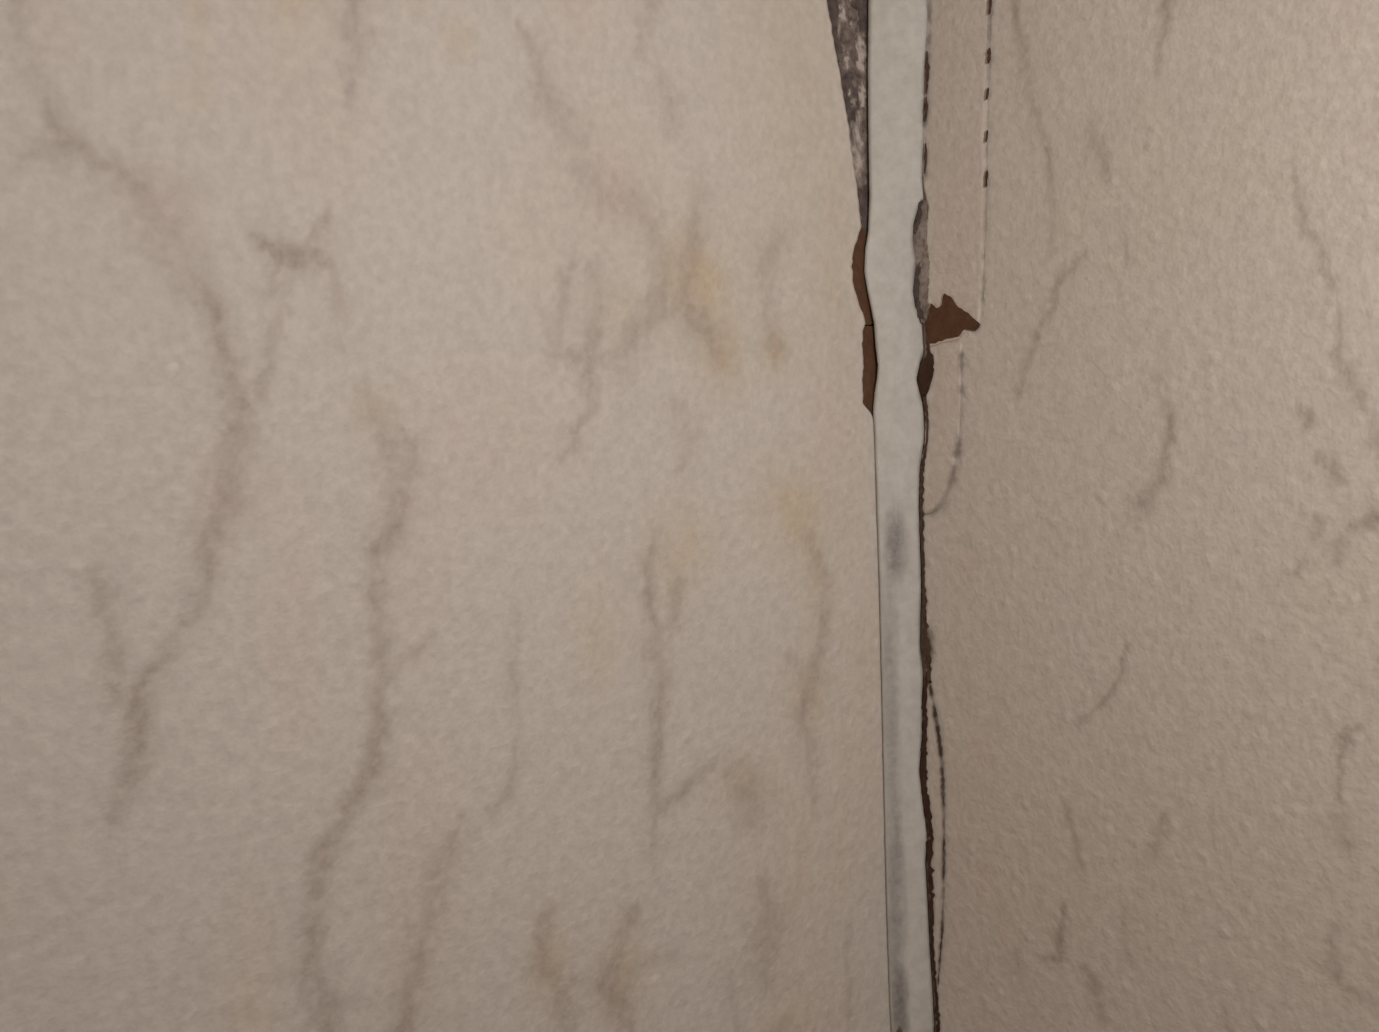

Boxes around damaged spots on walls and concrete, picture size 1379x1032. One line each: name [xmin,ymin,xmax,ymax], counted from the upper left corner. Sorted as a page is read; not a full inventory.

crack [923,51,931,174]
crack [984,48,992,187]
crack [923,320,931,350]
crack [918,395,959,1032]